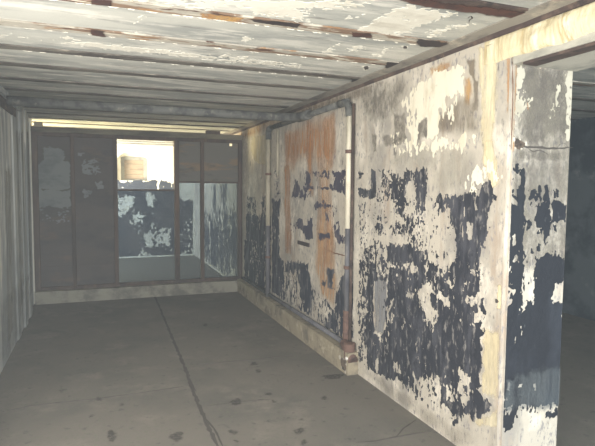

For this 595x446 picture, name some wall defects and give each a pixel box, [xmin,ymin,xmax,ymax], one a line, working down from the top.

peeling [60,31,301,71]
corrosion [201,14,243,22]
peeling [125,0,375,31]
peeling [358,4,476,58]
peeling [391,64,476,158]
peeling [244,169,346,337]
peeling [351,159,503,426]
peeling [503,163,567,432]
crack [154,297,223,446]